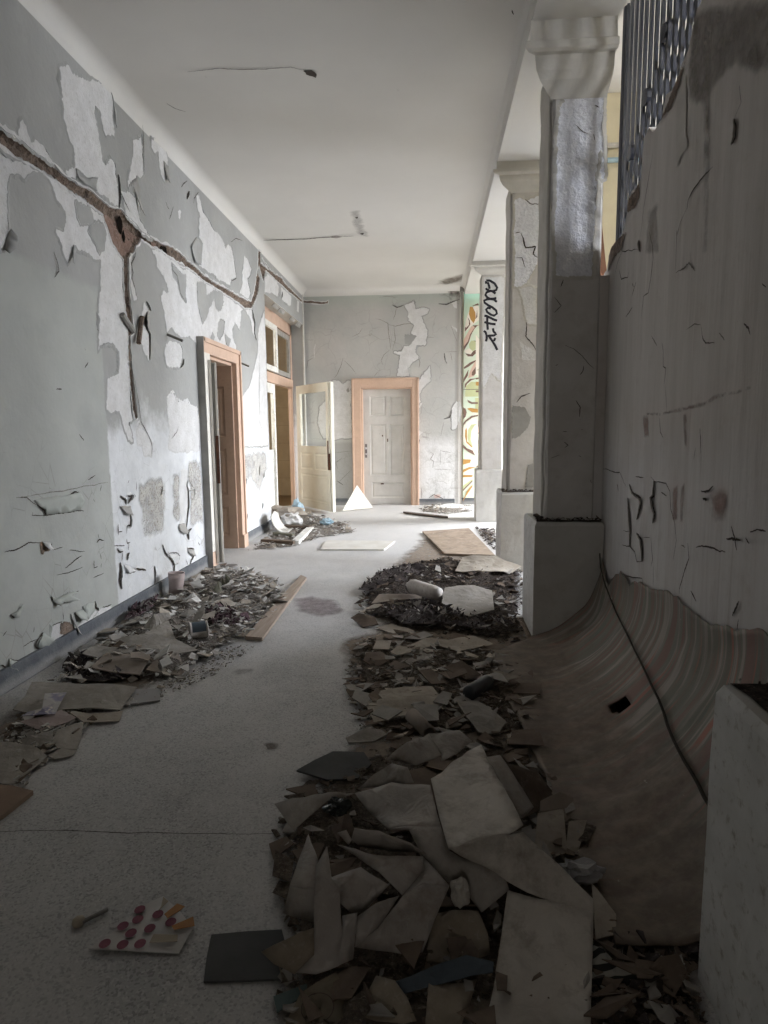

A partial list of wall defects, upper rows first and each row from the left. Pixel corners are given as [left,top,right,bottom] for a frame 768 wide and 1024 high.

crack [731,86,741,145]
peeling [0,61,329,489]
crack [283,234,350,242]
peeling [393,300,432,408]
peeling [481,97,626,390]
crack [615,155,711,437]
crack [689,323,750,344]
peeling [444,400,462,431]
spalling [6,541,62,555]
peeling [115,390,203,589]
crack [590,469,766,589]
peeling [23,591,112,649]